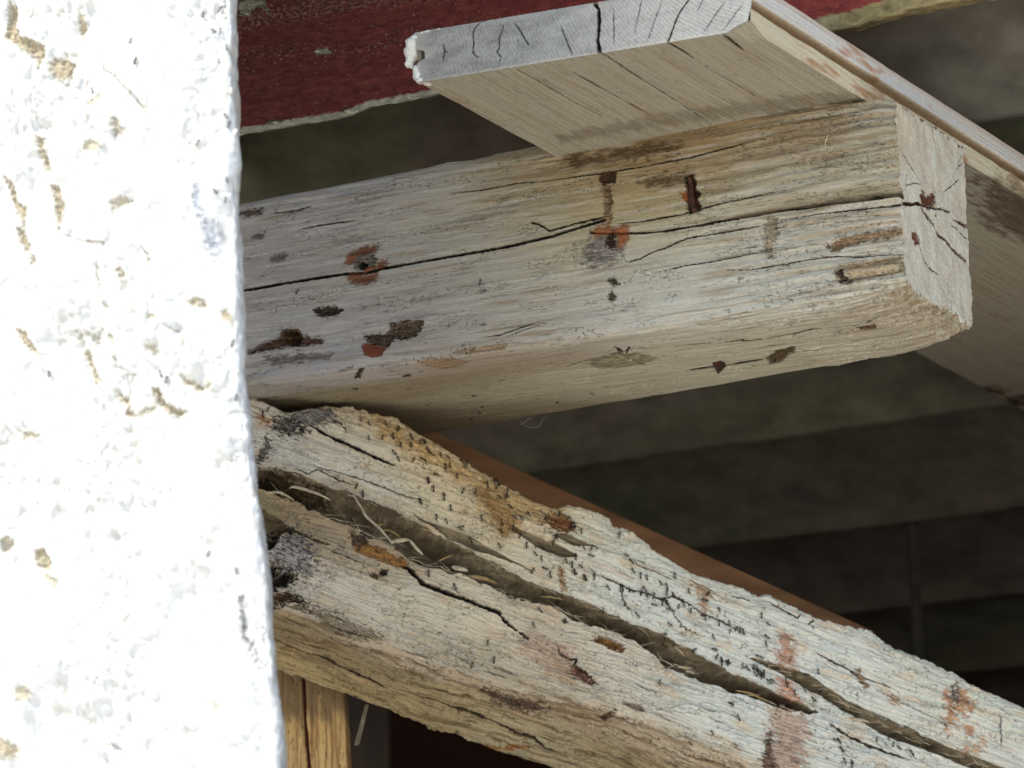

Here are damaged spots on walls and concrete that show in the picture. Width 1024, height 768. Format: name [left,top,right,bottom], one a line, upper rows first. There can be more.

crack [244,150,967,292]
corrosion [592,224,630,249]
corrosion [344,245,389,285]
corrosion [362,343,386,357]
crack [257,420,1002,768]